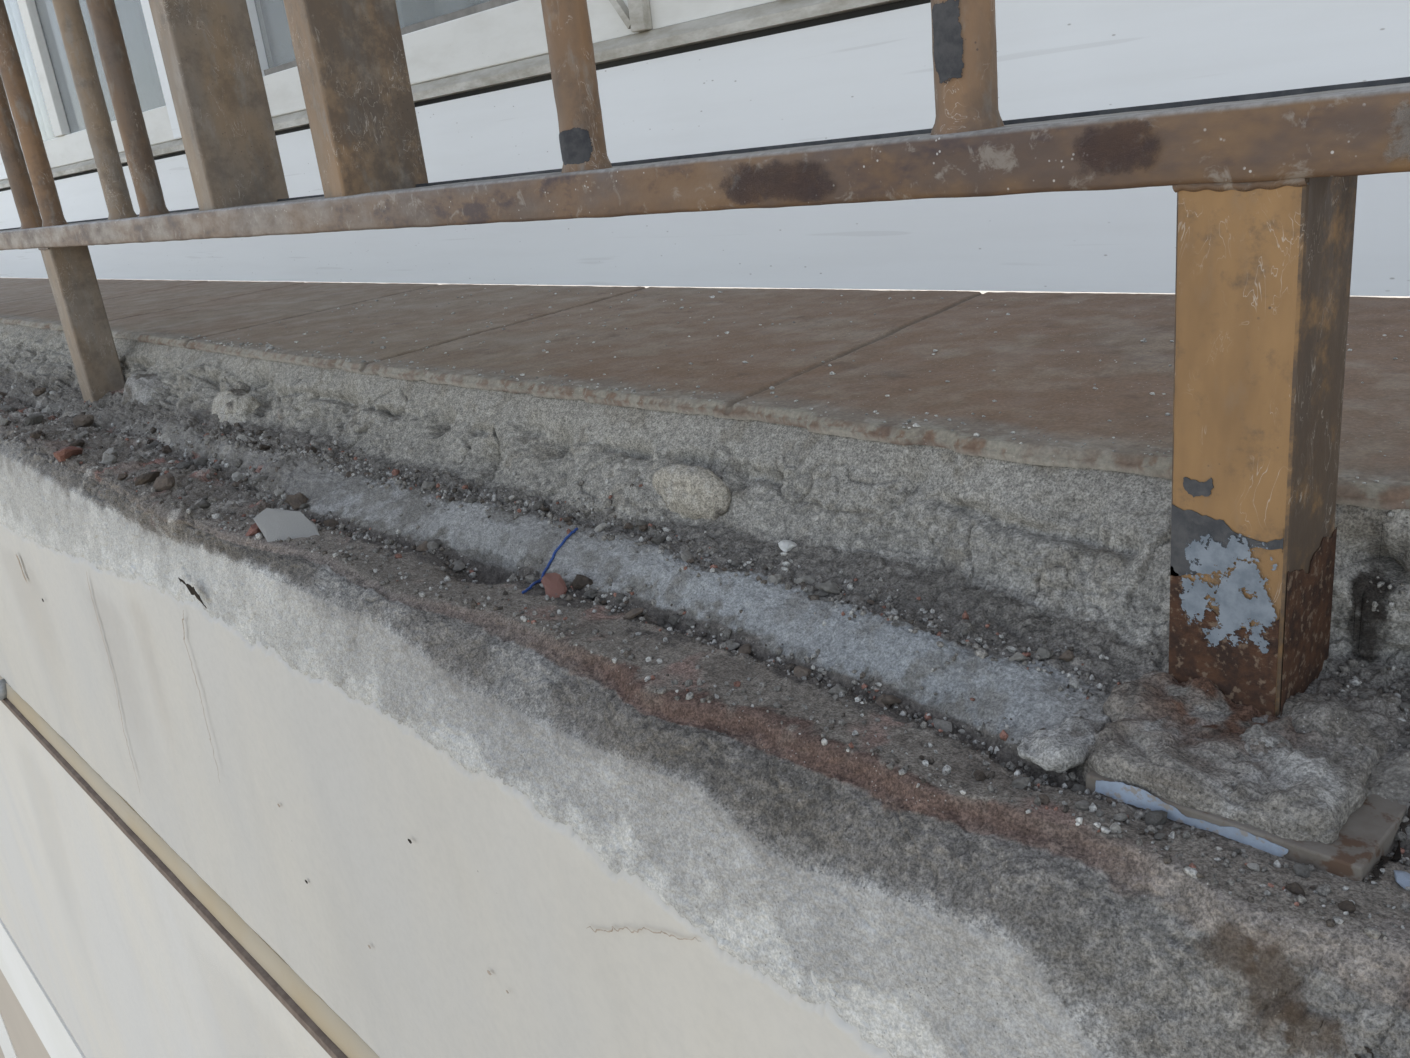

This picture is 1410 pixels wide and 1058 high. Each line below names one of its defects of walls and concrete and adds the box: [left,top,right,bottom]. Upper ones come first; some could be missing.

peeling [1078,122,1156,171]
spalling [0,323,1284,695]
rust [1169,527,1337,717]
spalling [0,426,1410,1058]
crack [1355,1046,1374,1058]